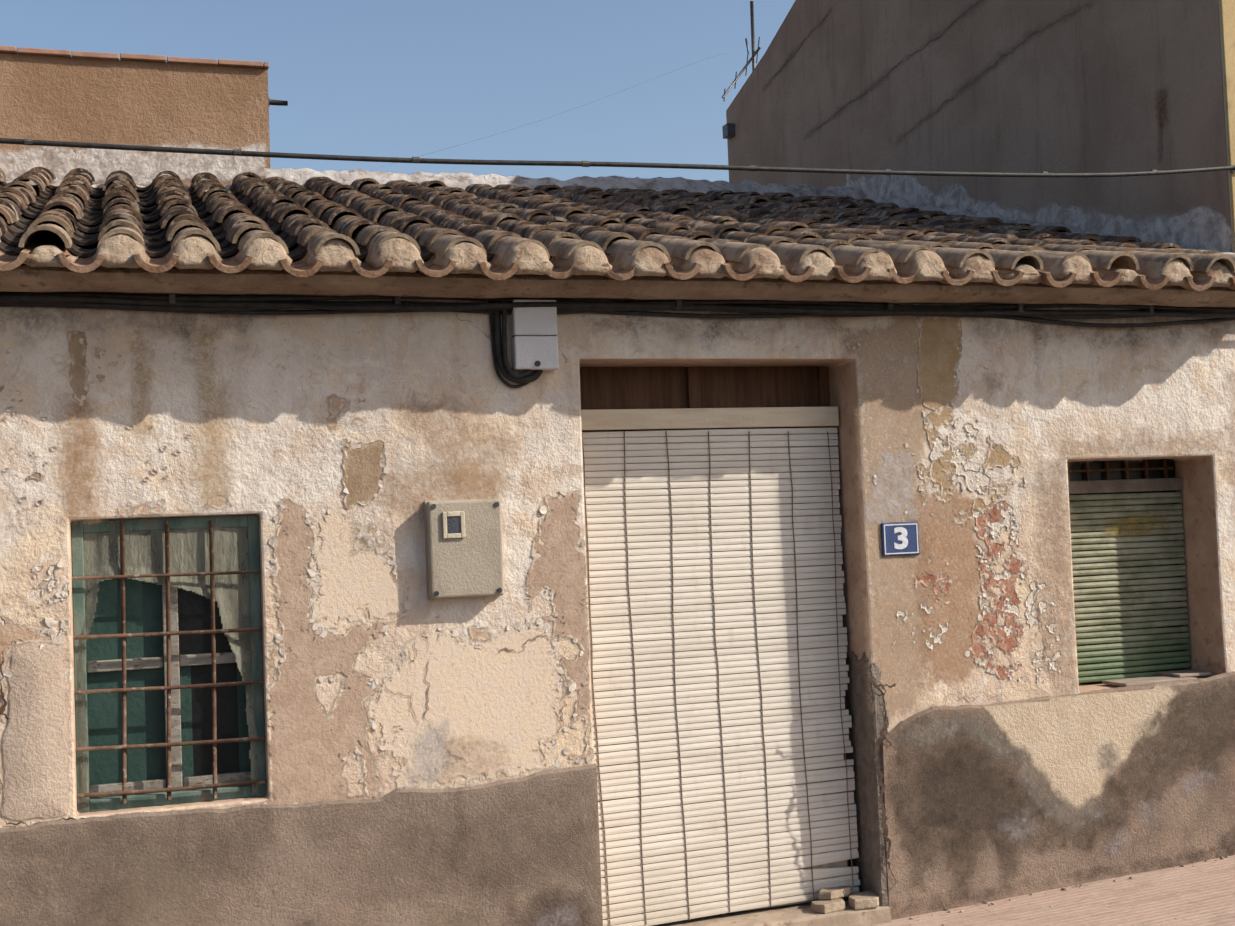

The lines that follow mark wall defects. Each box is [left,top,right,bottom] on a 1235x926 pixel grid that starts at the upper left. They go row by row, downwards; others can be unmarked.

spalling [27,446,57,481]
peeling [263,394,594,804]
crack [0,651,9,720]
crack [372,636,476,780]
crack [497,632,575,753]
crack [0,779,110,827]
water stain [892,683,1235,897]